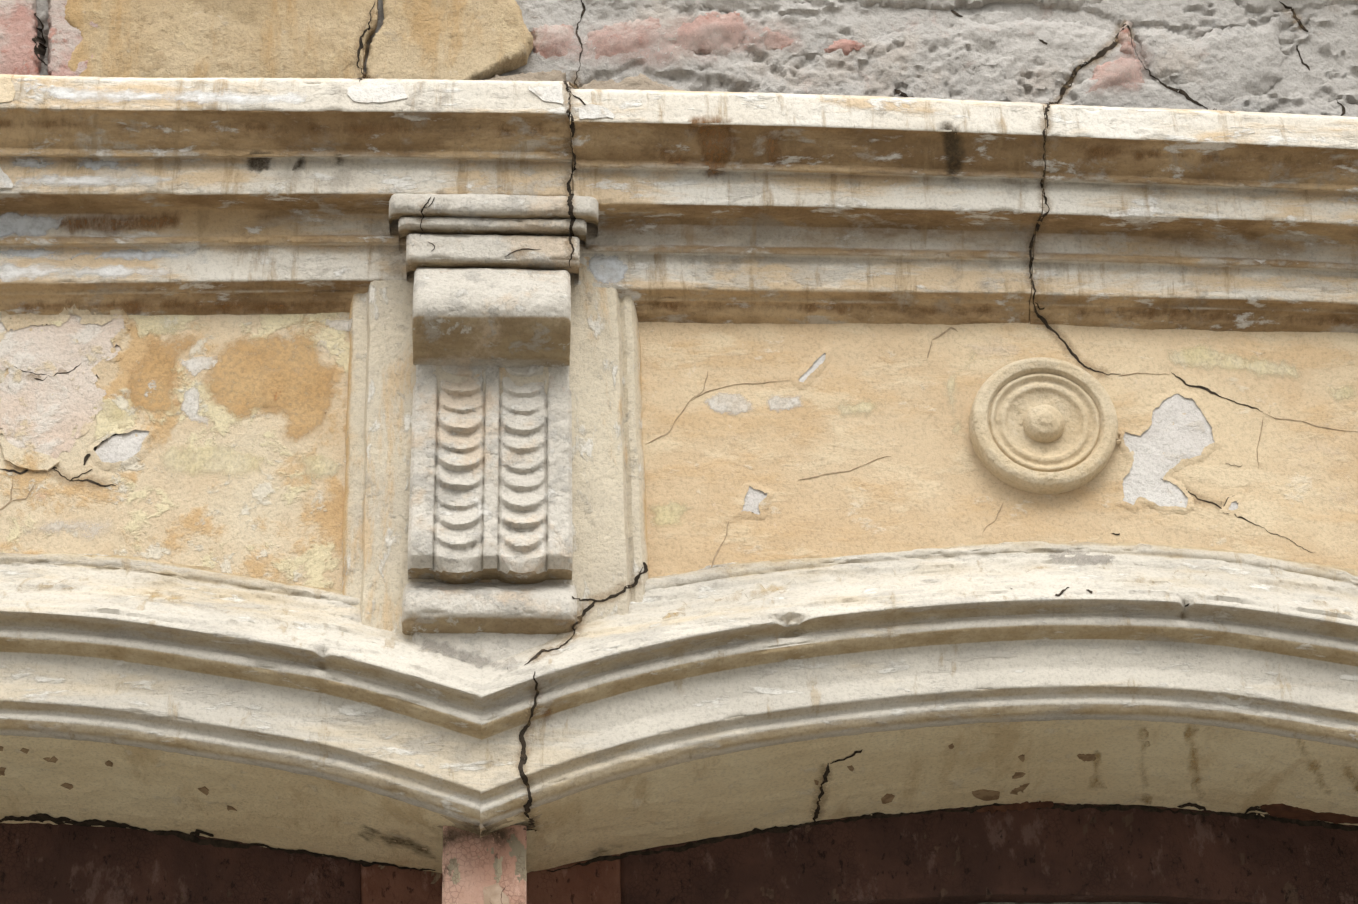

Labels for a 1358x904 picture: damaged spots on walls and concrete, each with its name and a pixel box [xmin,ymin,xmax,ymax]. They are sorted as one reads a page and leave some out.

flaking render [0,0,1287,120]
crack [894,89,915,98]
crack [1029,24,1357,553]
crack [0,428,125,510]
flaking render [724,479,775,523]
flaking render [1114,388,1223,515]
crack [518,562,648,832]
crack [547,750,1358,872]